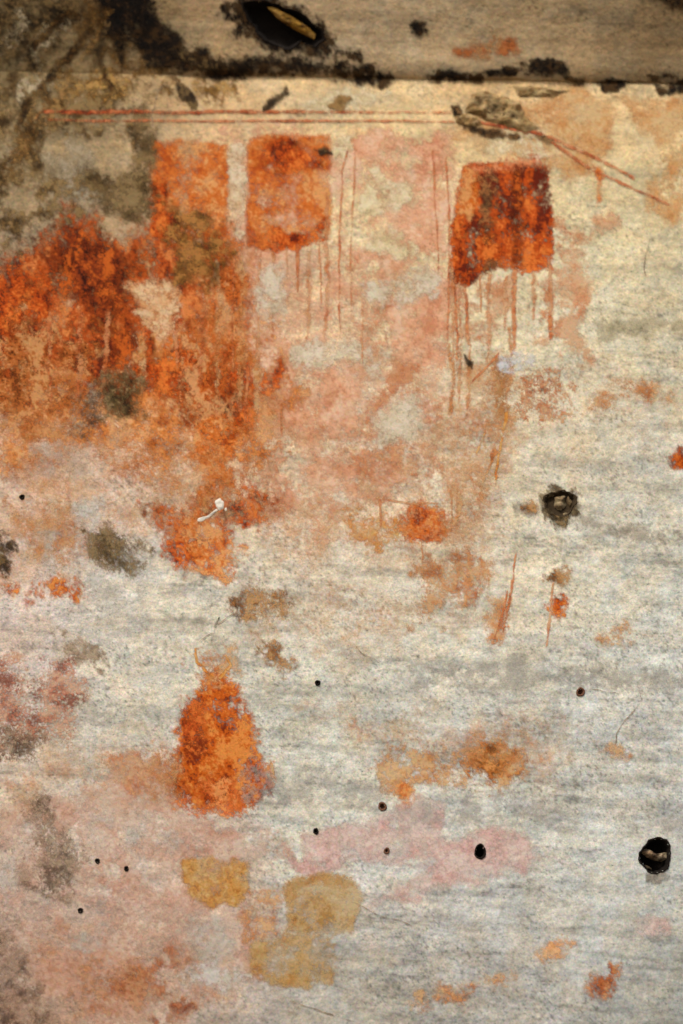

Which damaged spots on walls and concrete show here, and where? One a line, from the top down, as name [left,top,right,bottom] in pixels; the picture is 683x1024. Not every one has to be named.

water stain [409,20,430,36]
water stain [428,56,585,86]
water stain [597,77,626,92]
water stain [646,73,683,95]
water stain [0,0,394,368]
corrosion [0,134,332,604]
corrosion [317,153,576,646]
water stain [82,523,153,576]
corrosion [148,646,276,818]
corrosion [377,730,550,807]
corrosion [585,961,622,1000]